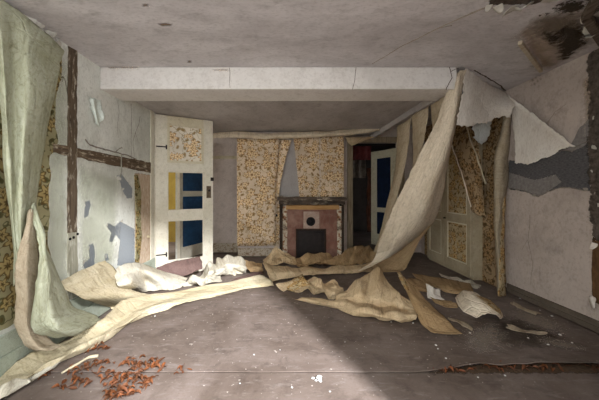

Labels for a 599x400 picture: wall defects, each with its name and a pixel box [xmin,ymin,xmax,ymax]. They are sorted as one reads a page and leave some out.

spalling [485,0,559,17]
flaking render [83,244,95,268]
peeling [106,173,151,266]
peeling [279,138,299,197]
peeling [374,96,445,253]
flaking render [456,68,597,296]